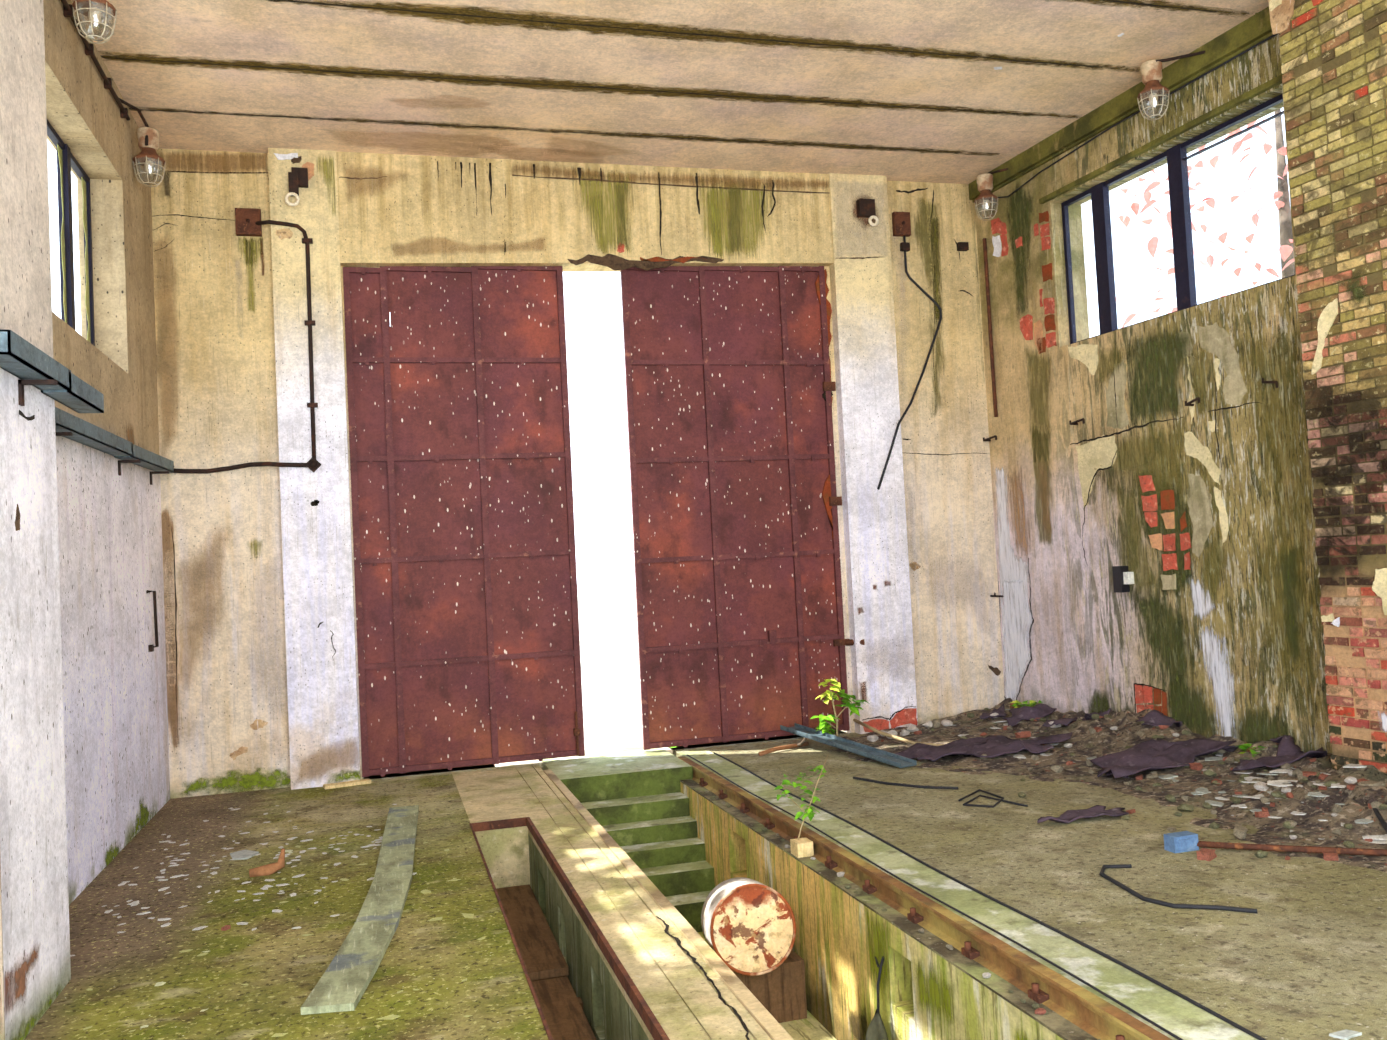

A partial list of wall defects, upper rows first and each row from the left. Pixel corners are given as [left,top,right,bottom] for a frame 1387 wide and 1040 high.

peeling [1268,0,1295,35]
peeling [991,211,1129,536]
peeling [1311,298,1338,375]
flaking render [1137,322,1247,596]
leakage [161,512,178,746]
peeling [996,468,1032,700]
leakage [1191,579,1234,736]
peeling [1321,613,1340,627]
peeling [1372,568,1387,615]
crack [656,916,750,1040]
leakage [849,1008,867,1040]